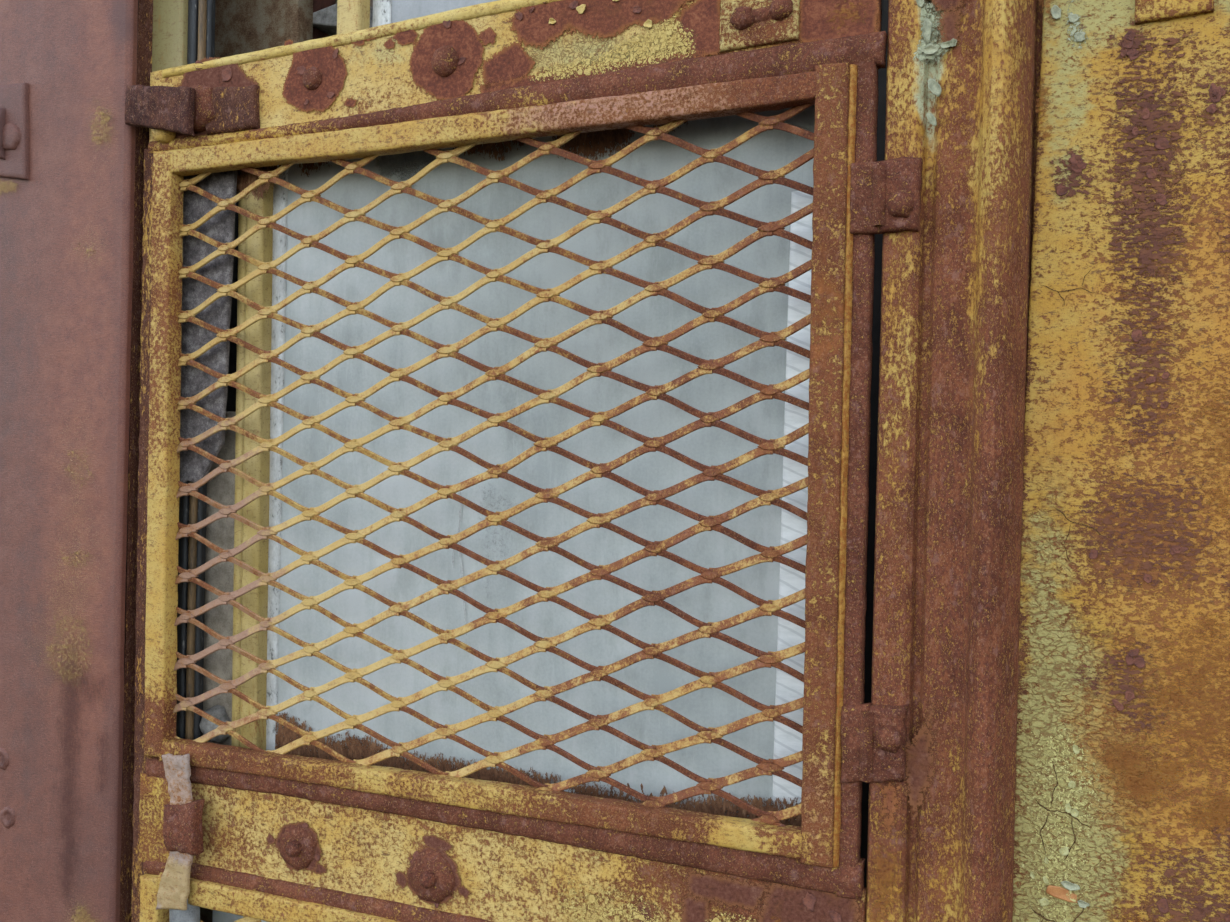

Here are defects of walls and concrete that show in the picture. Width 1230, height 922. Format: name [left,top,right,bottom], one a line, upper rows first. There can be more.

corrosion [180,57,258,88]
corrosion [282,0,723,113]
peeling [530,15,696,82]
peeling [913,0,957,64]
peeling [1051,0,1088,48]
corrosion [550,128,635,160]
corrosion [1049,21,1230,792]
corrosion [275,712,802,826]
crack [1036,765,1088,859]
peeling [1021,721,1103,922]
peeling [555,877,679,922]
crack [1031,908,1084,922]